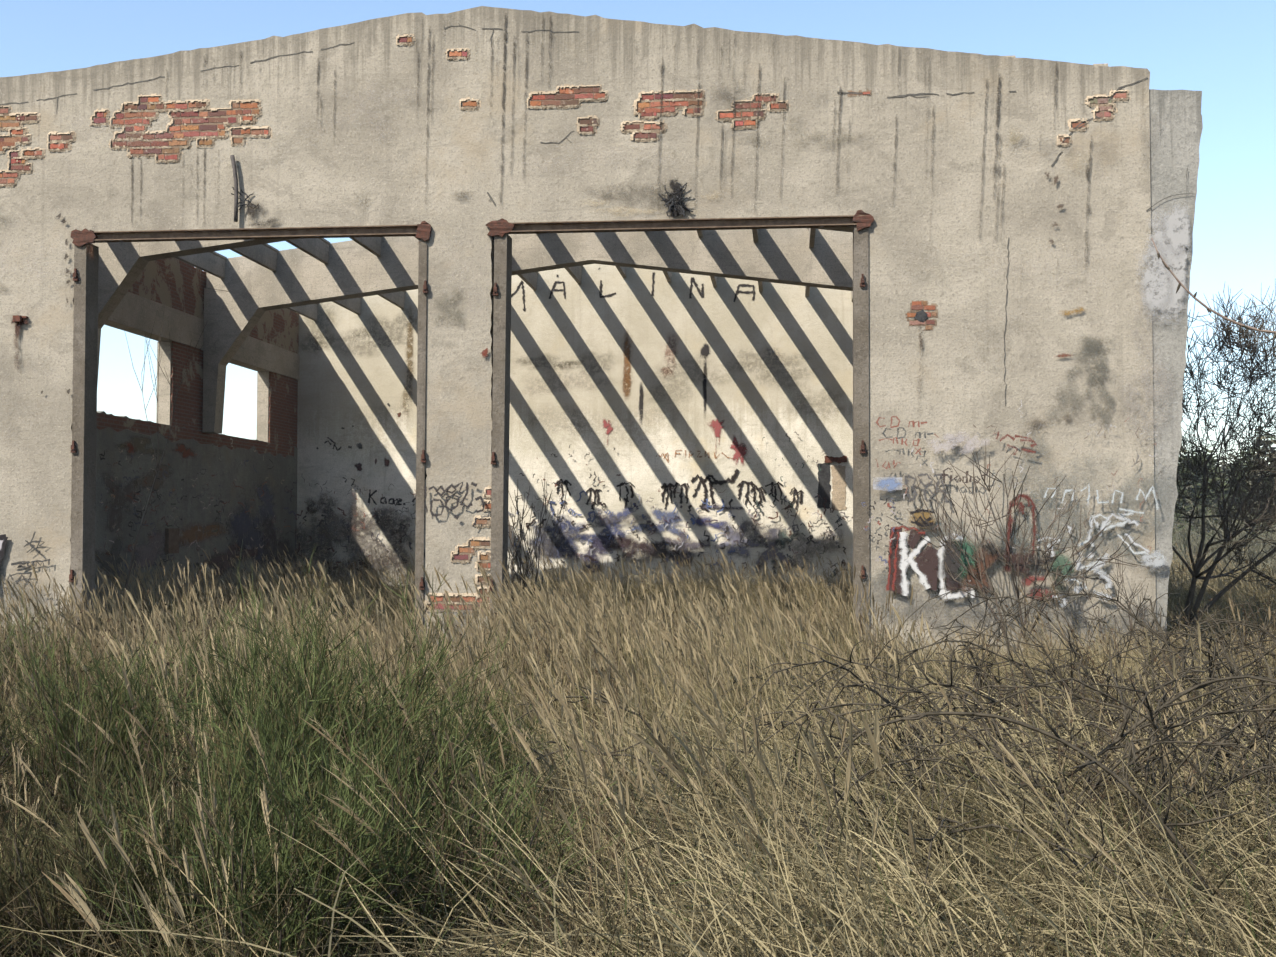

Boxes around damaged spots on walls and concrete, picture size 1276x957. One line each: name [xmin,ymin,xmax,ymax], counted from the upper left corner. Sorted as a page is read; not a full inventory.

flaking render [0,105,76,187]
flaking render [89,93,273,163]
water stain [491,13,528,201]
flaking render [526,83,608,135]
flaking render [620,89,790,142]
flaking render [1057,89,1131,147]
crack [1051,77,1148,166]
rust [11,320,28,364]
rust [623,337,631,395]
flaking render [905,300,938,331]
flaking render [424,485,492,614]